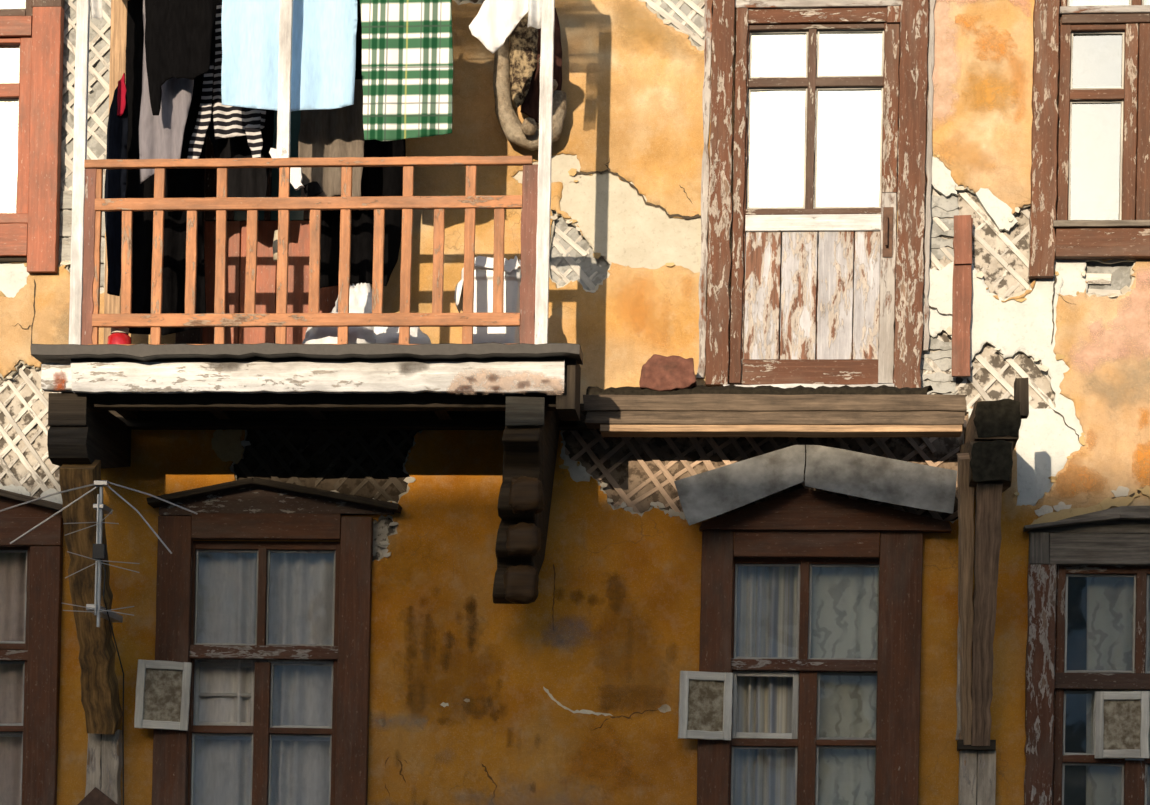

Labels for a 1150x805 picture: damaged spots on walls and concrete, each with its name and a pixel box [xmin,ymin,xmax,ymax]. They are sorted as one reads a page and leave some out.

flaking render [644,0,713,51]
flaking render [513,153,708,293]
crack [576,158,701,219]
flaking render [0,262,32,298]
crack [15,280,36,356]
flaking render [559,153,1146,521]
flaking render [0,364,63,504]
flaking render [211,430,422,503]
flaking render [373,517,399,561]
crack [543,686,658,730]